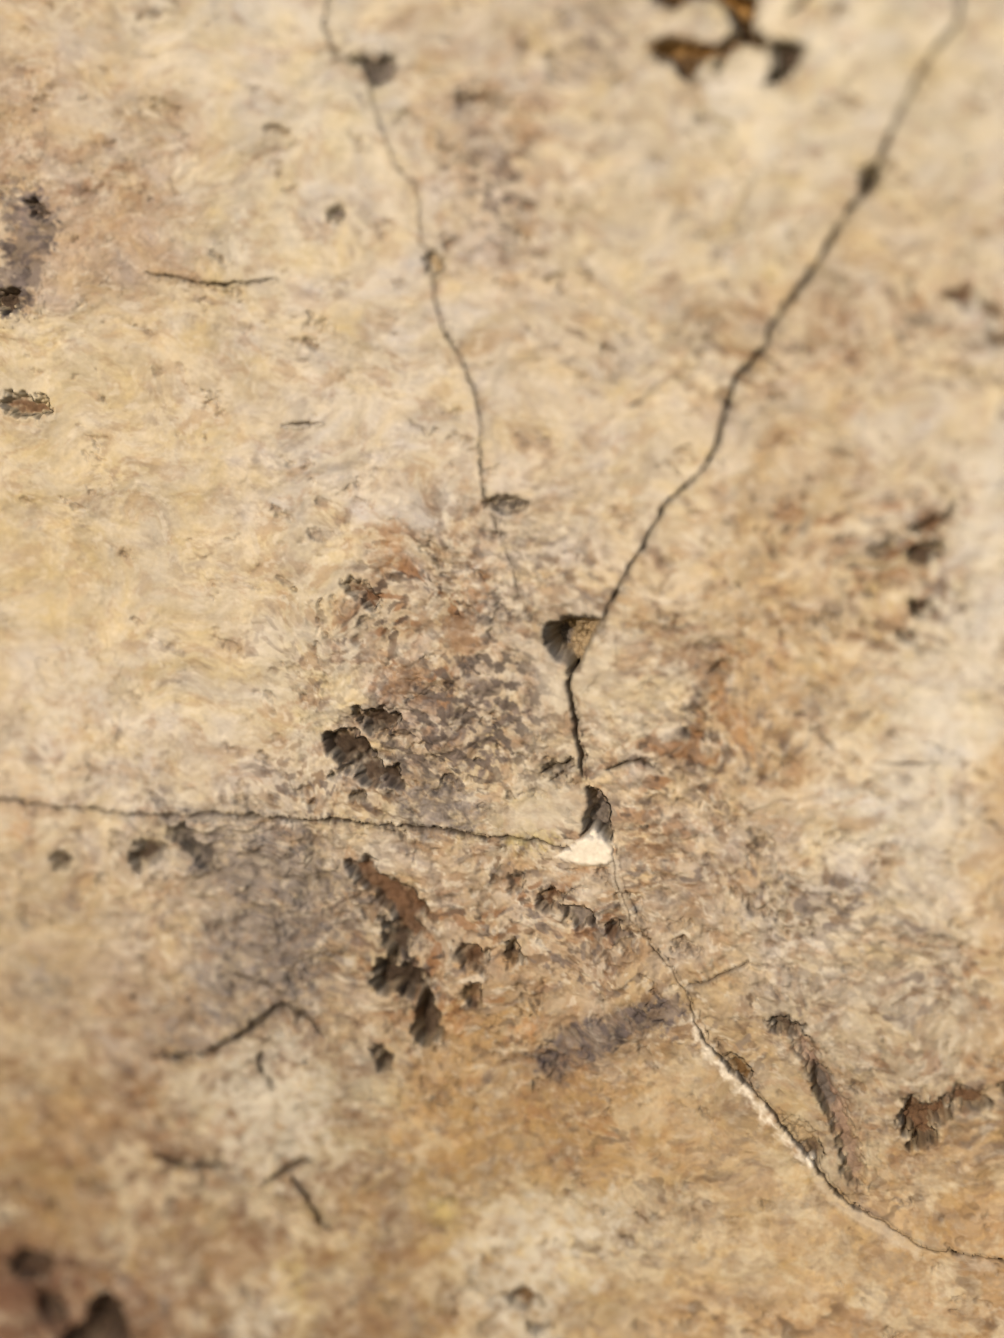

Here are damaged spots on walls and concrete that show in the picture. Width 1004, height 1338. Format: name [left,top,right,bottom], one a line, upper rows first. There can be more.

spalling [642,0,808,86]
crack [319,0,564,629]
crack [600,0,966,625]
spalling [322,704,405,798]
peeling [526,614,617,719]
crack [540,655,691,781]
crack [0,794,572,854]
peeling [492,773,637,932]
crack [146,968,329,1092]
spalling [343,854,444,1042]
spalling [455,937,525,1002]
crack [609,843,1004,1277]